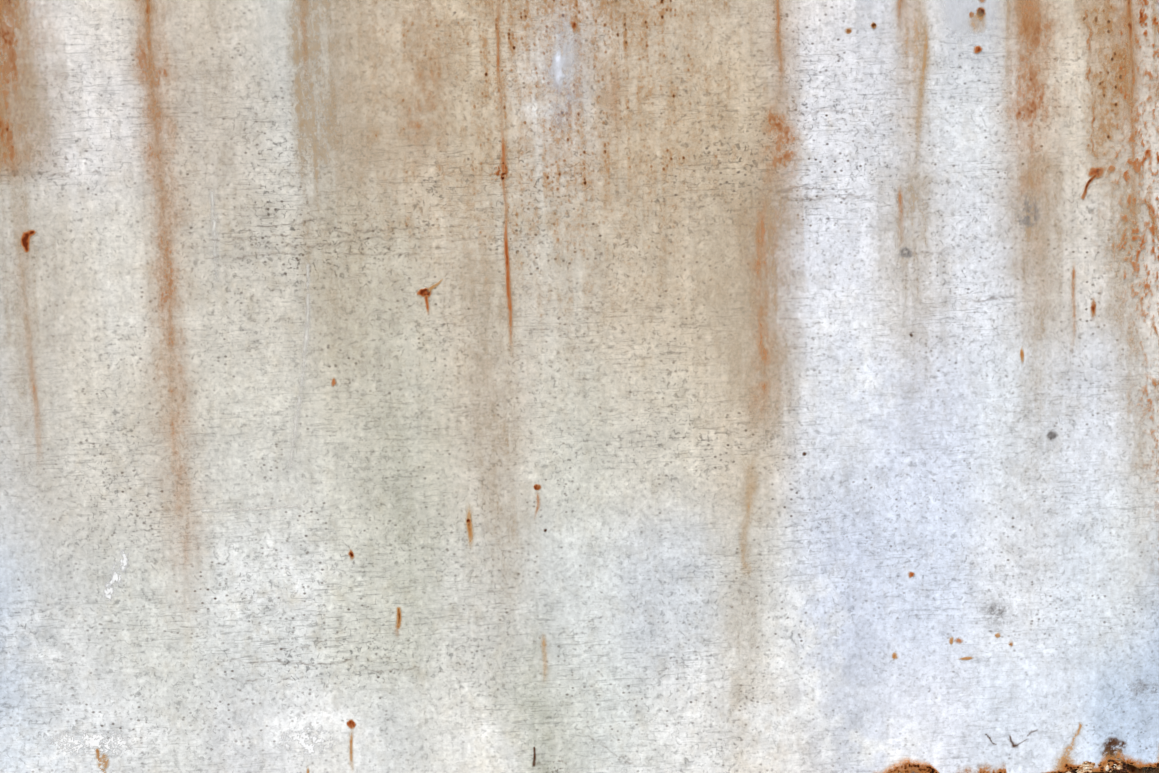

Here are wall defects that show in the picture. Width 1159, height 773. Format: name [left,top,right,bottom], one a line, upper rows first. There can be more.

corrosion [0,0,29,168]
corrosion [21,230,35,252]
corrosion [136,0,175,345]
corrosion [403,0,693,337]
corrosion [766,110,795,168]
corrosion [969,0,985,26]
corrosion [1013,0,1052,151]
corrosion [1081,0,1135,199]
corrosion [1046,724,1159,773]